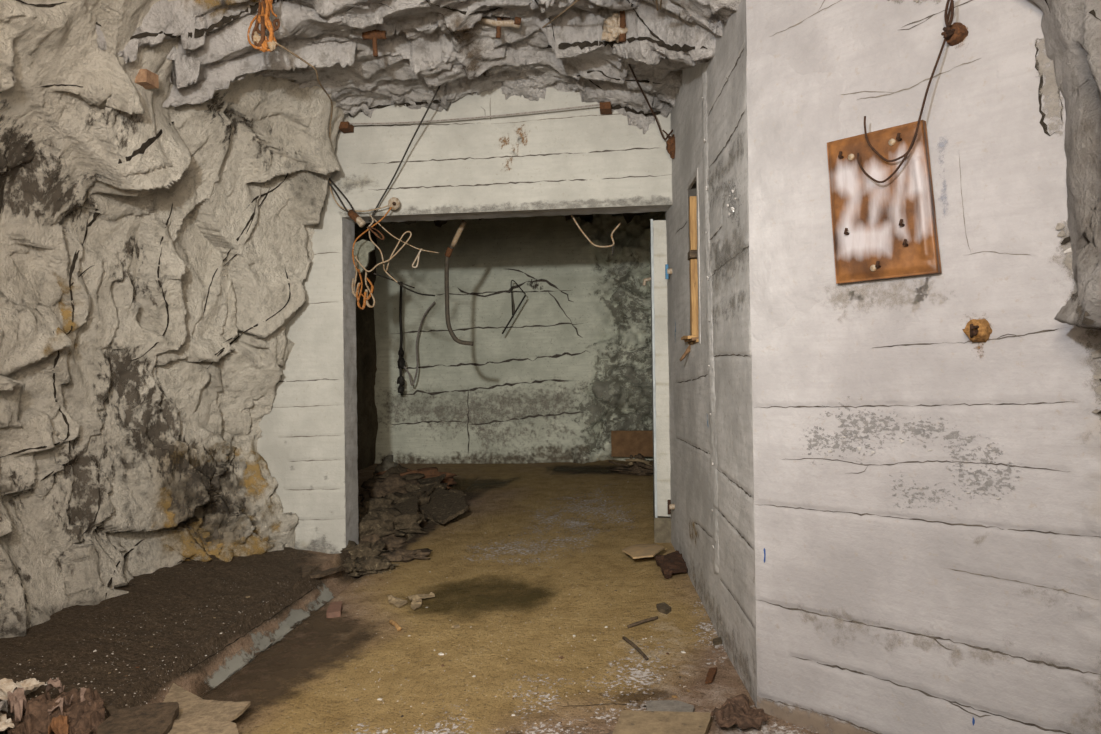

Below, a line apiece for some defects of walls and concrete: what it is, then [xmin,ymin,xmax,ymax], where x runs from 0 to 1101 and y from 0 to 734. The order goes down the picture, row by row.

corrosion [970,319,986,357]